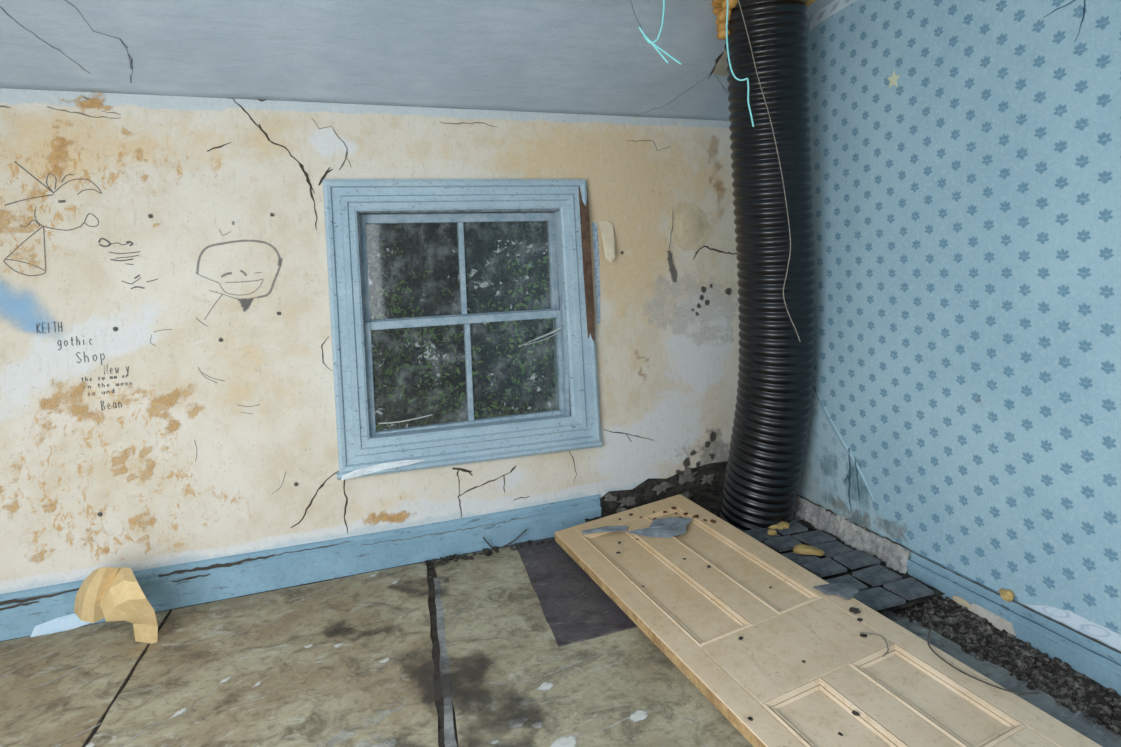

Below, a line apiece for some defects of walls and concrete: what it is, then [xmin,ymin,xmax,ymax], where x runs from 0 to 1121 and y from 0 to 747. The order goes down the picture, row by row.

crack [0,7,120,119]
crack [65,0,133,83]
crack [1043,0,1085,42]
crack [230,98,351,230]
leakage [692,284,731,316]
leakage [676,432,716,474]
crack [291,471,348,533]
crack [452,466,530,518]